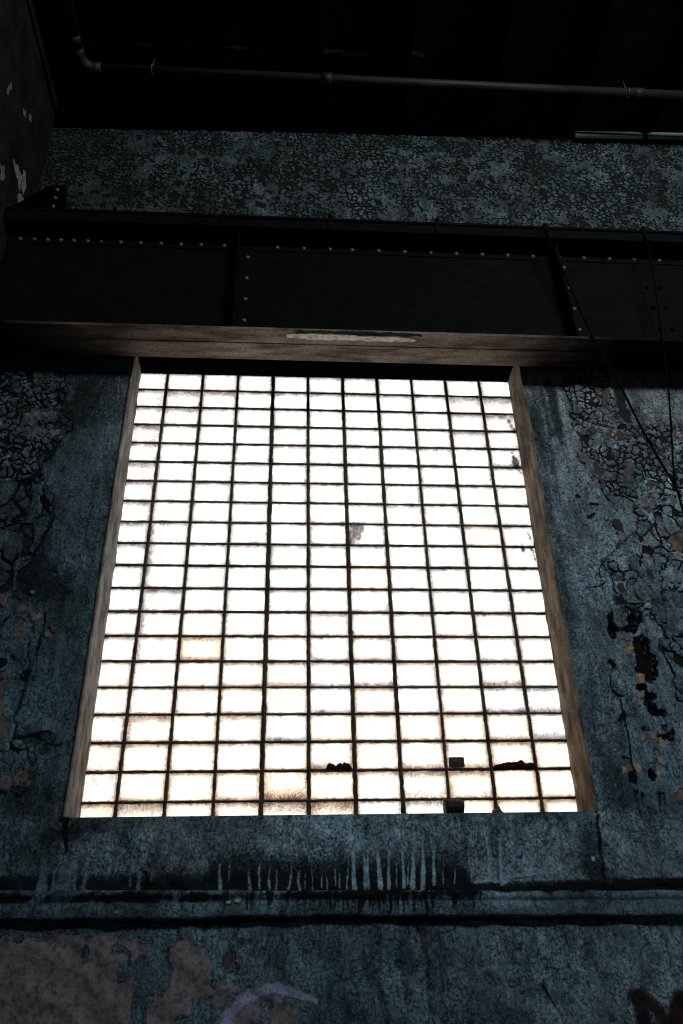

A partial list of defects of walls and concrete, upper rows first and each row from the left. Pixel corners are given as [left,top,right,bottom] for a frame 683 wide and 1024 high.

peeling [0,364,74,796]
peeling [562,371,683,803]
peeling [0,928,301,1024]
leakage [248,841,455,891]